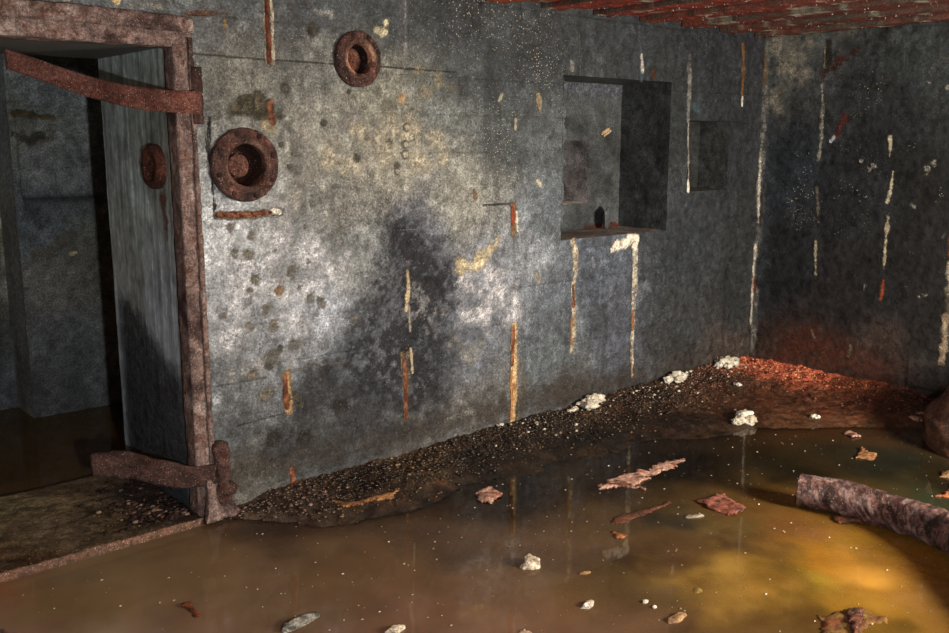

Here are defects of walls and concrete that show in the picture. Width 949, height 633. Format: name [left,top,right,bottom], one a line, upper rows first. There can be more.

water stain [817,30,856,161]
water stain [750,36,812,353]
efflorescence [883,171,894,266]
efflorescence [454,237,521,326]
rust [938,252,949,365]
water stain [229,365,646,484]
rust [510,322,529,422]